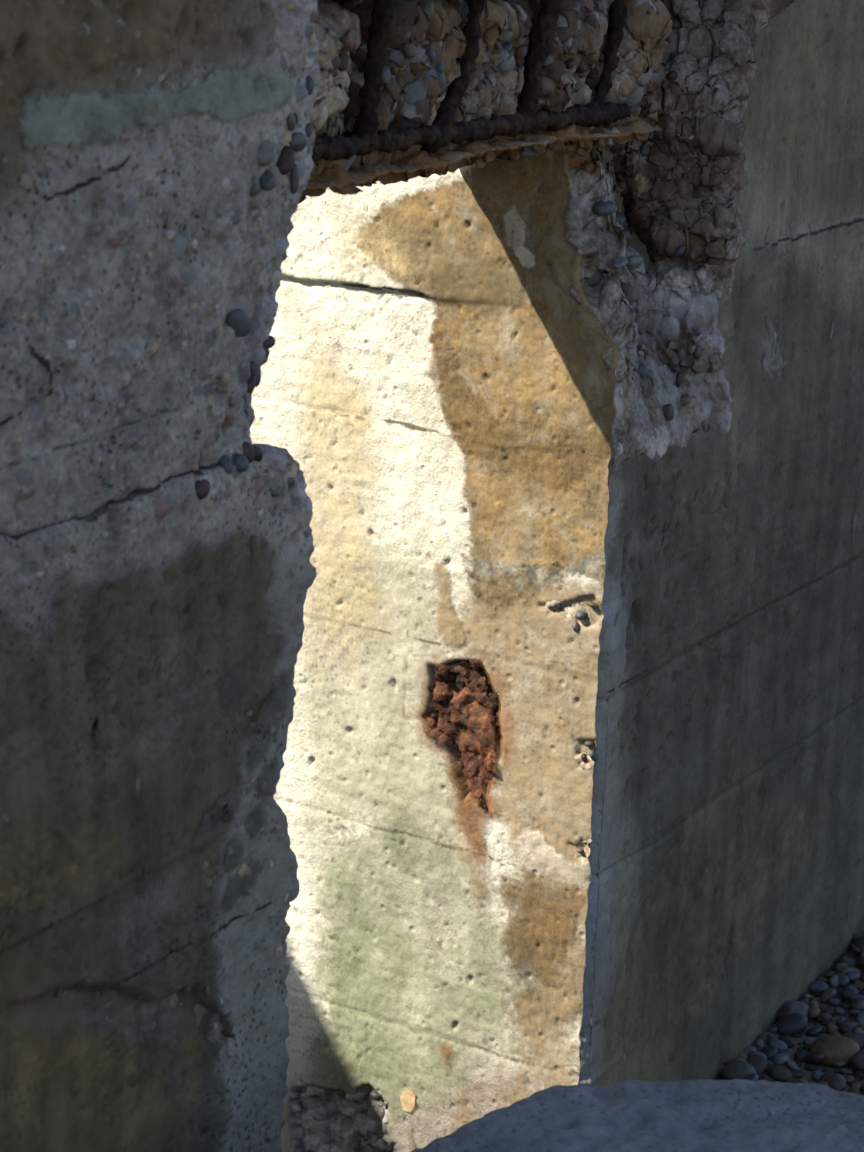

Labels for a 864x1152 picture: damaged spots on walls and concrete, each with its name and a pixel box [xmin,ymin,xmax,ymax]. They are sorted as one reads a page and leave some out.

leakage [0,0,277,153]
spalling [219,0,781,513]
crack [754,218,864,251]
crack [0,461,236,548]
spalling [195,479,210,499]
leakage [351,149,864,1102]
leakage [0,527,290,1152]
corrosion [447,738,502,892]